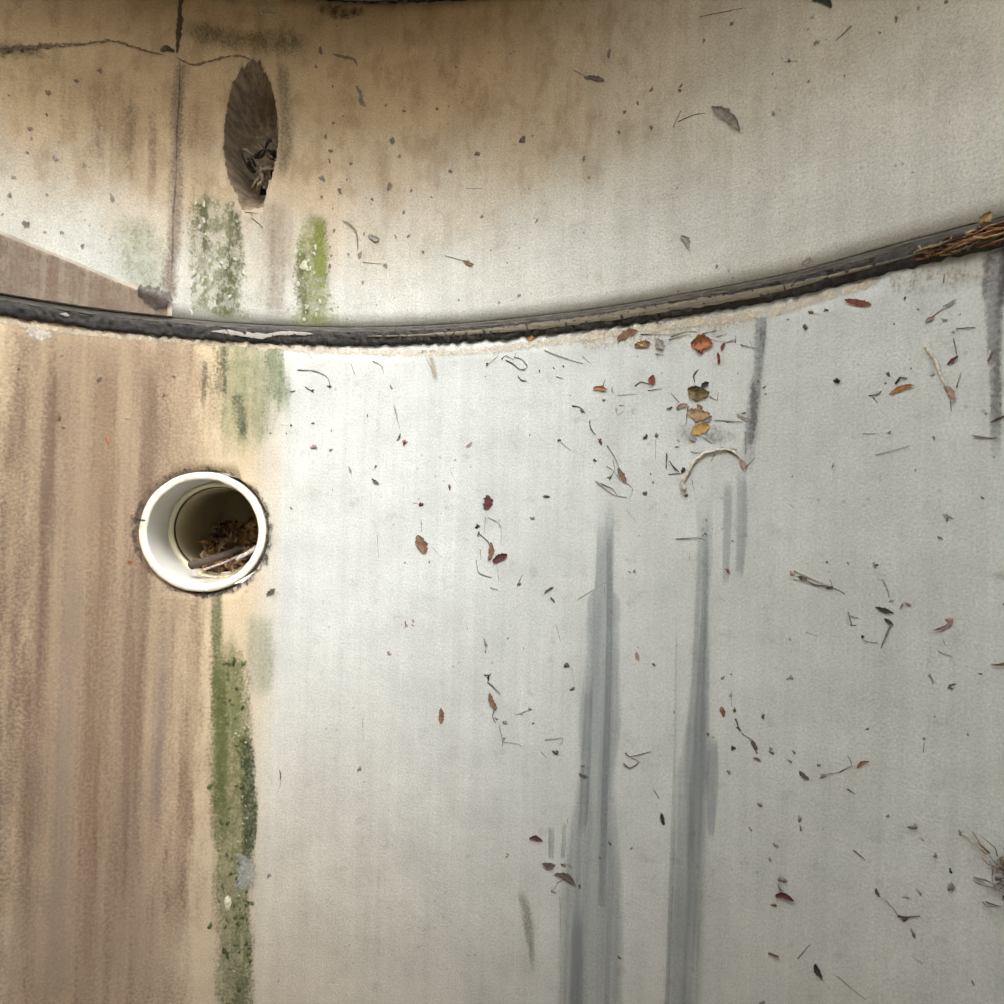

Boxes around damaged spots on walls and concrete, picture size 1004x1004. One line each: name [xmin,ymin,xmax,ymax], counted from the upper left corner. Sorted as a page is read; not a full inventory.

crack [0,0,264,270]
crack [334,54,365,106]
crack [320,0,464,19]
crack [343,221,359,249]
water stain [982,248,1004,426]
water stain [1,280,872,1004]